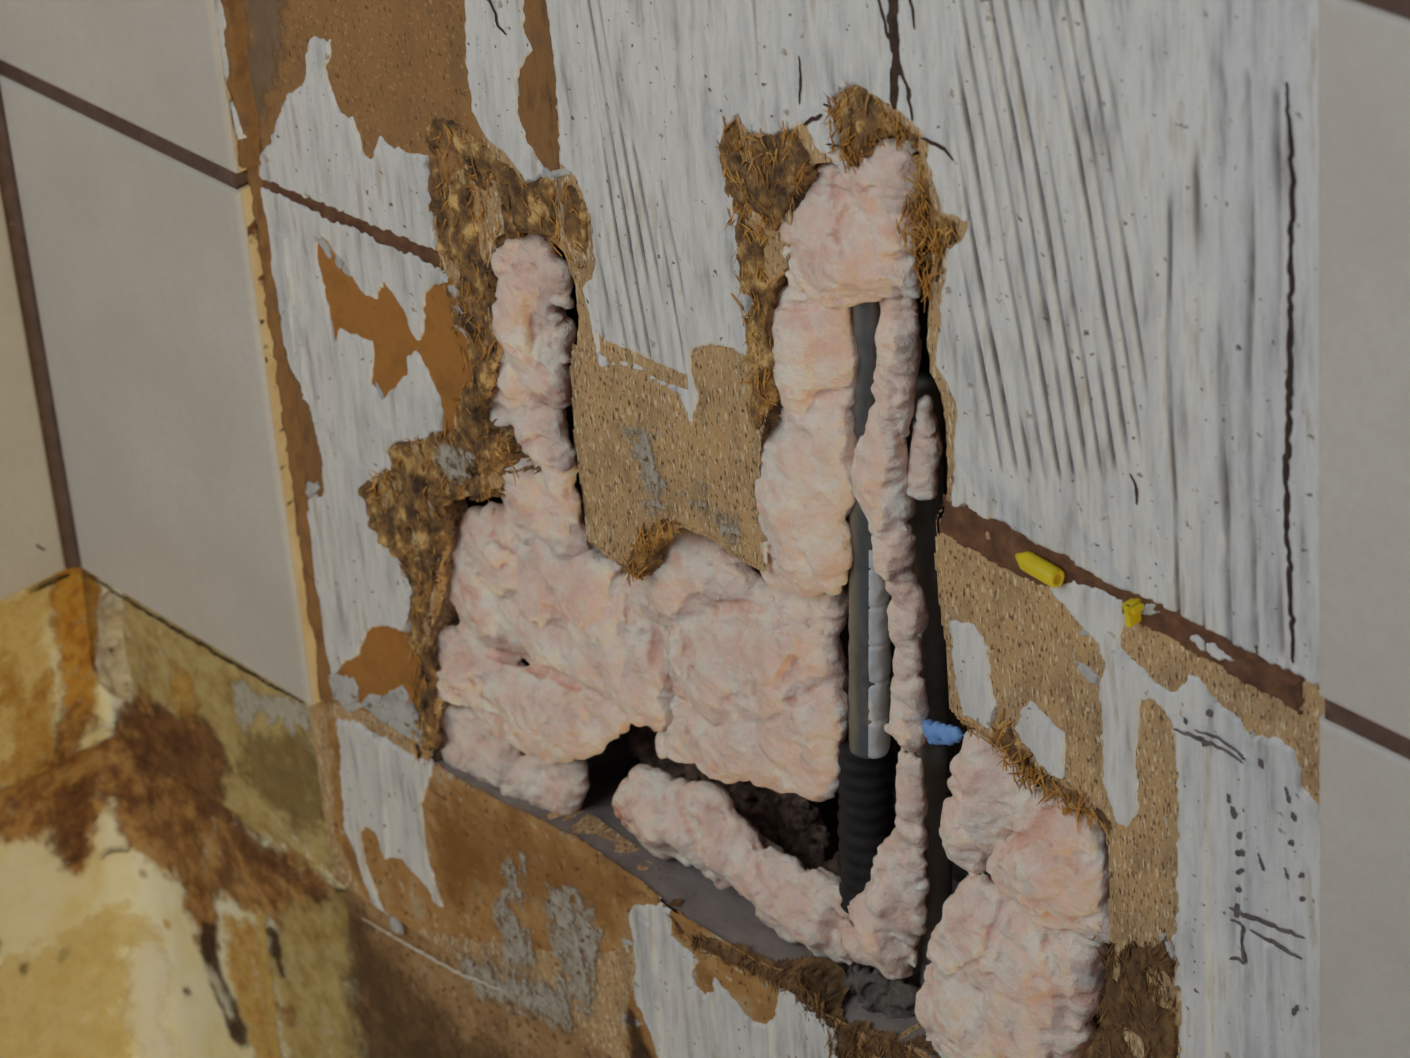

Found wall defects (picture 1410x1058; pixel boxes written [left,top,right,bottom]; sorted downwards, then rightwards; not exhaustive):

crack [877,0,953,160]
peeling [317,238,475,484]
peeling [570,343,769,574]
crack [1282,82,1296,663]
leakage [0,581,60,788]
leakage [123,594,366,1058]
peeling [232,680,310,735]
peeling [327,626,879,1058]
peeling [934,506,1303,961]
leakage [0,904,158,1058]
spalling [200,921,248,1046]
leakage [625,1009,650,1058]